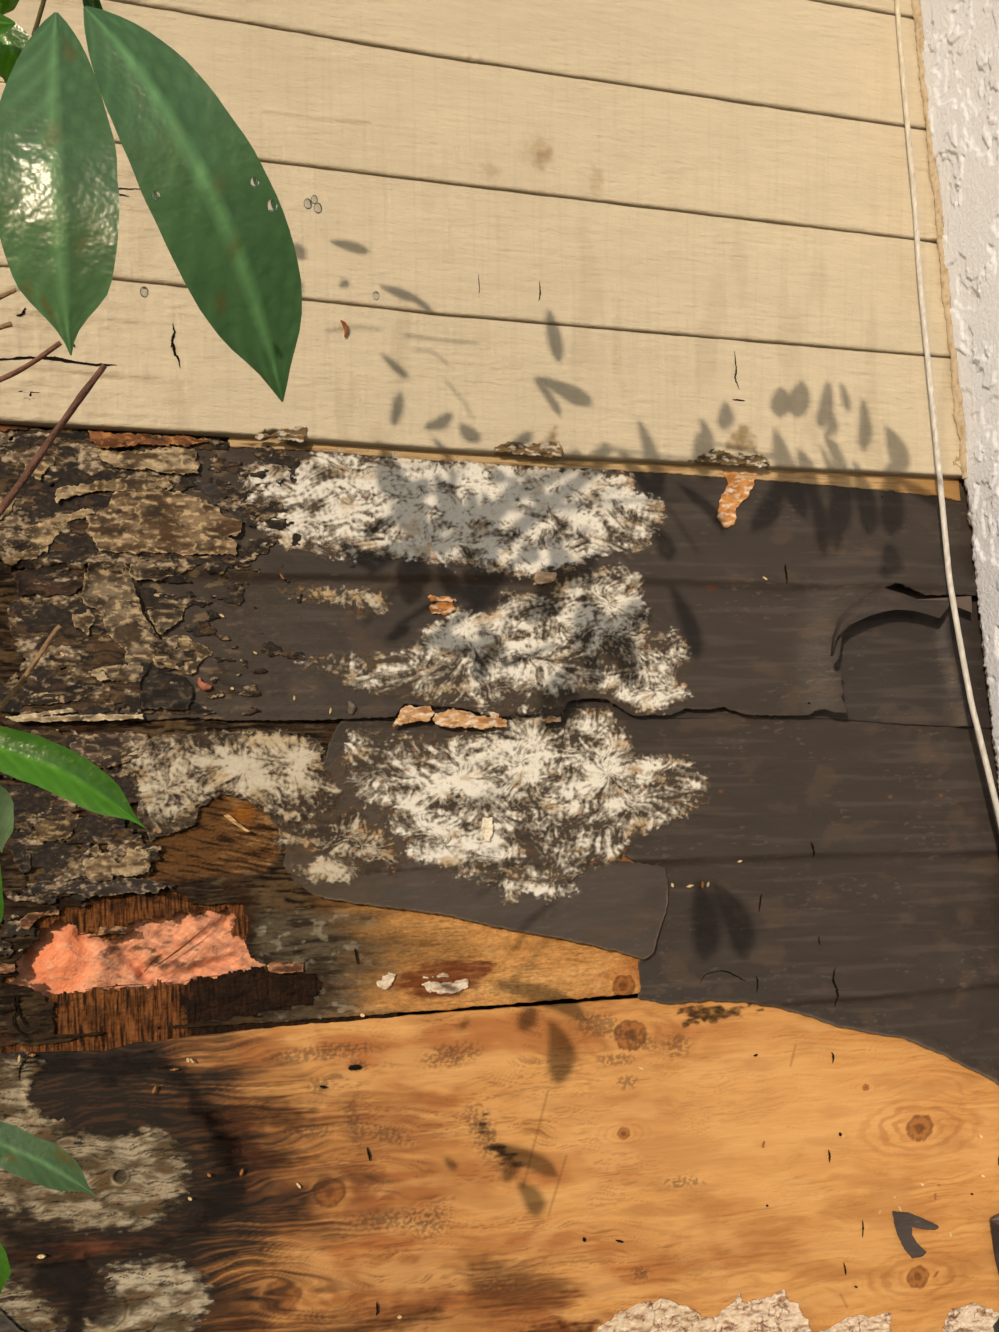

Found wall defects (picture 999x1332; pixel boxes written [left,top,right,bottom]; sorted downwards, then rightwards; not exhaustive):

peeling [0,424,32,432]
spalling [494,441,564,459]
peeling [0,430,326,775]
leakage [97,449,708,905]
peeling [4,789,322,899]
peeling [376,972,396,990]
peeling [421,973,469,994]
leakage [15,1051,308,1243]
leakage [2,1224,92,1332]
leakage [343,1307,438,1332]
peeling [597,1289,892,1332]
peeling [942,1303,999,1332]